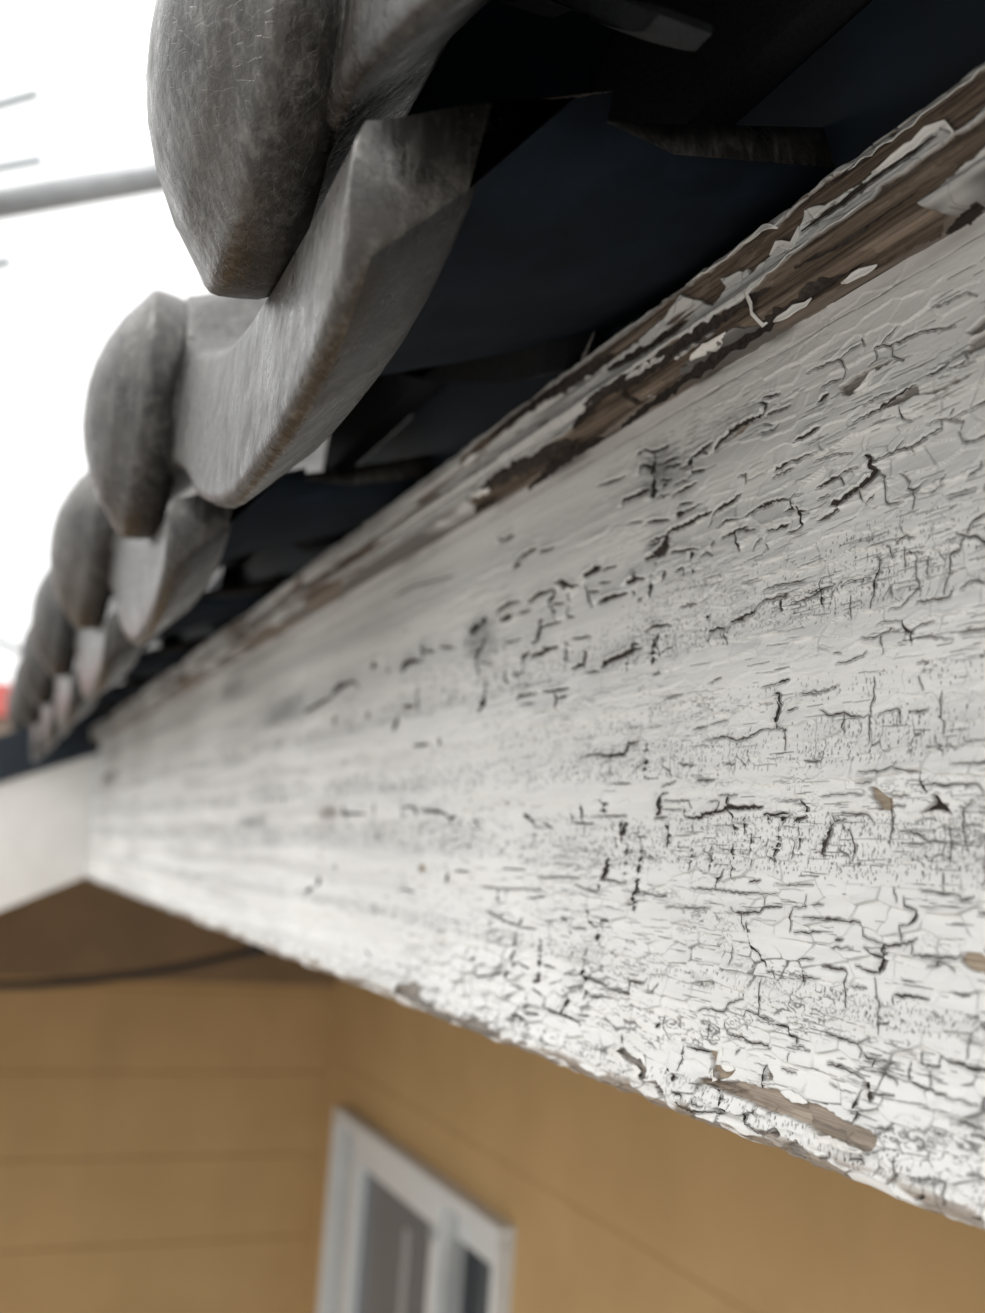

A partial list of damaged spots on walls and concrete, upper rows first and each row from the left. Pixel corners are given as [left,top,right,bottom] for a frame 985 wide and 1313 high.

peeling [460,63,985,515]
peeling [559,579,580,594]
crack [304,127,985,1203]
peeling [708,1048,877,1158]